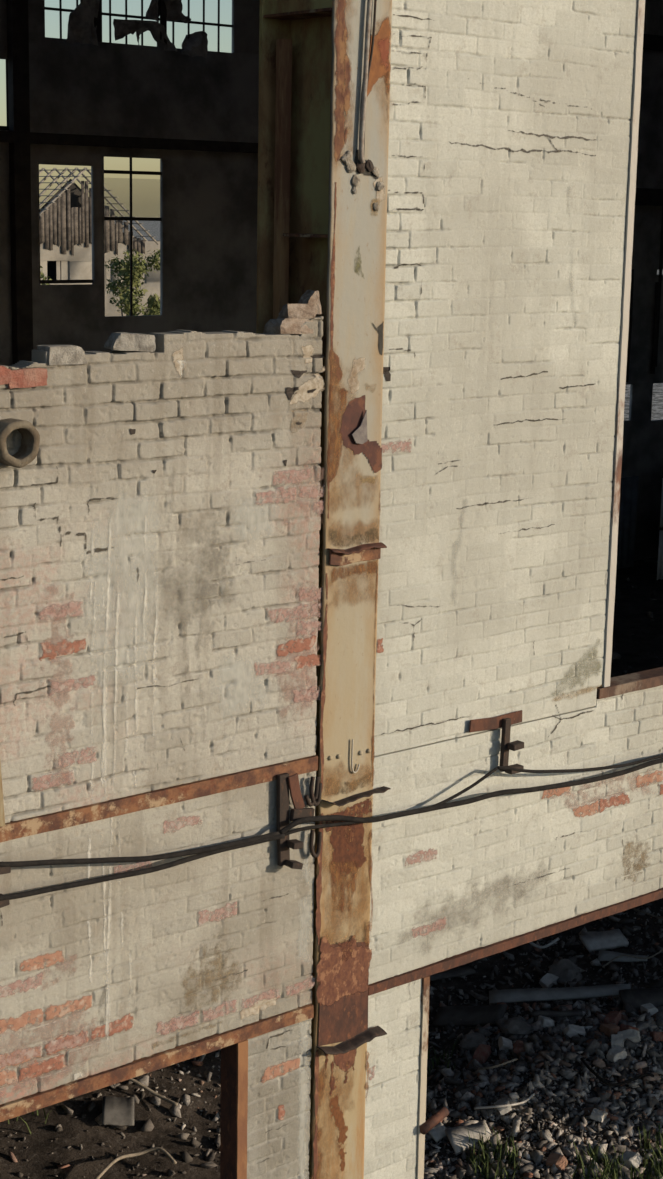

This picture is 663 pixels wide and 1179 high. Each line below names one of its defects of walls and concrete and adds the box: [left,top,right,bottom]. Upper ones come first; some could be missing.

rust [334,0,351,162]
rust [367,17,391,96]
crack [449,130,596,156]
crack [501,371,594,389]
crack [497,417,558,425]
peeling [254,587,322,676]
rust [316,561,378,1006]
peeling [573,770,663,817]
peeling [0,995,92,1034]
peeling [0,1013,134,1085]
rust [312,1049,369,1179]